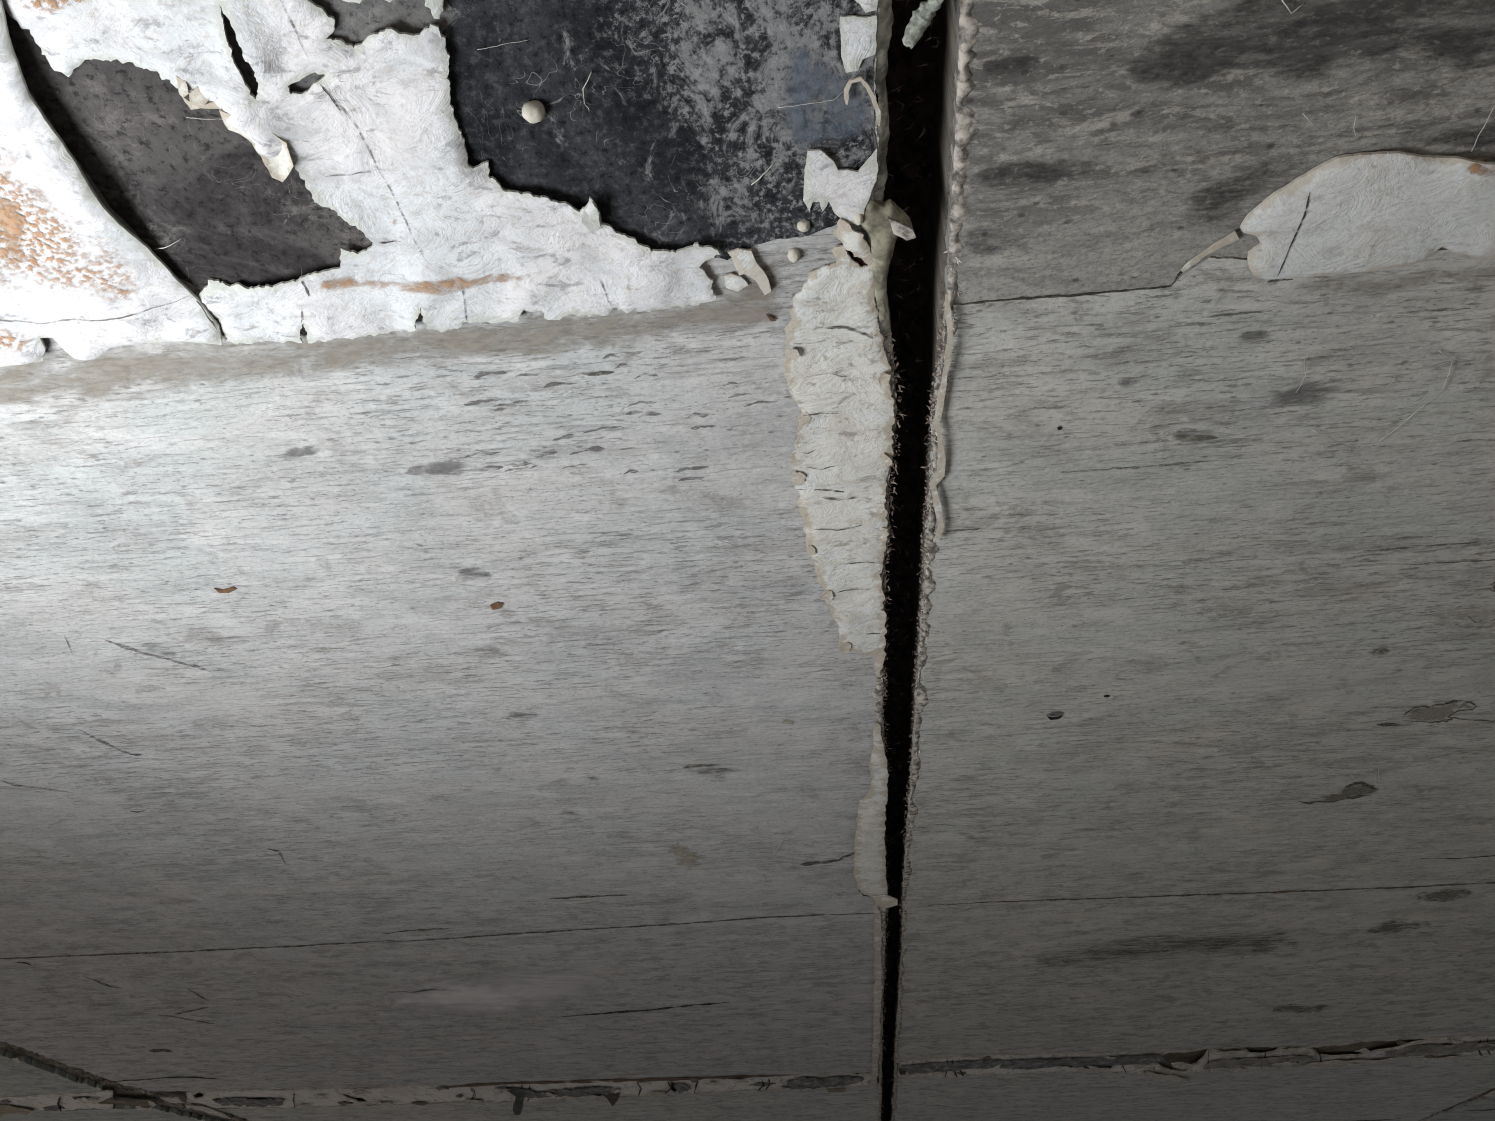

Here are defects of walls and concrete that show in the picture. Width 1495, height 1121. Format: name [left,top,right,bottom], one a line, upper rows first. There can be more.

damp [984,57,1036,75]
damp [1131,0,1495,86]
corrosion [0,175,128,296]
damp [982,161,1085,182]
damp [1190,171,1275,218]
peeling [1240,151,1495,284]
damp [1430,127,1495,175]
peeling [0,0,979,1121]
crack [802,855,851,866]
crack [111,1075,216,1083]
crack [637,1080,698,1096]